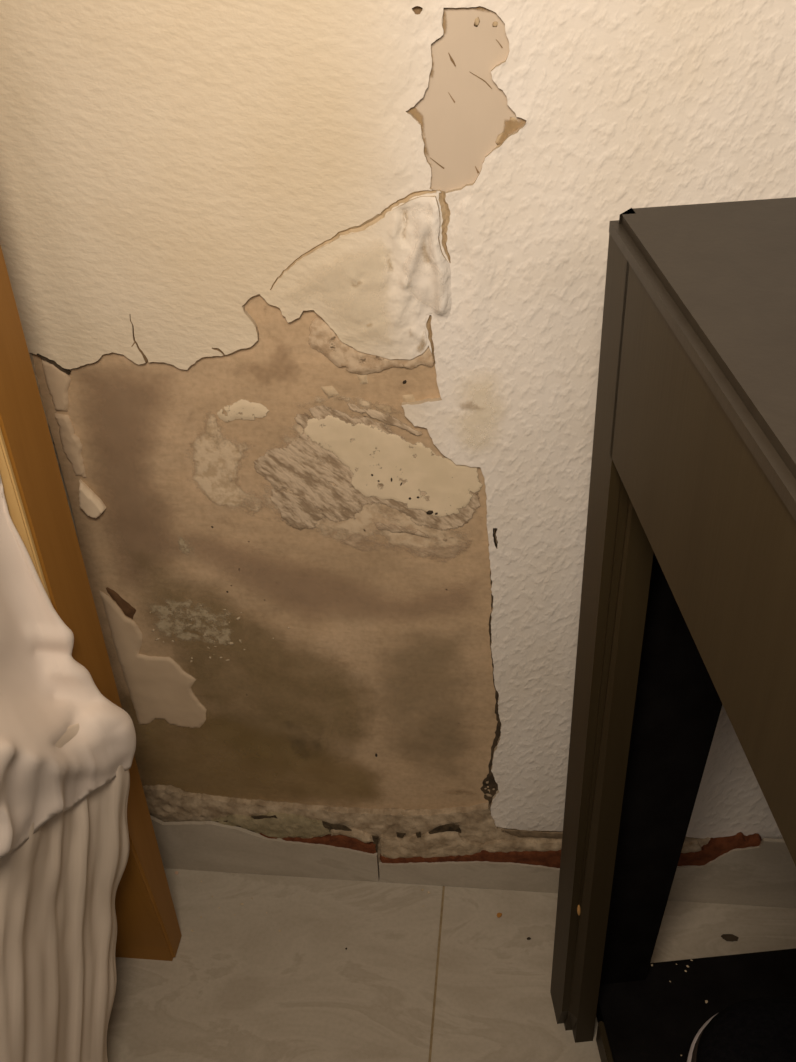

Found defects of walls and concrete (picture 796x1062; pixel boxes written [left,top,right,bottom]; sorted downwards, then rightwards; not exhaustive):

flaking render [408,6,526,193]
crack [37,354,71,375]
crack [130,316,148,362]
water stain [98,384,165,569]
flaking render [32,294,563,869]
water stain [131,596,372,799]
spalling [677,832,762,866]